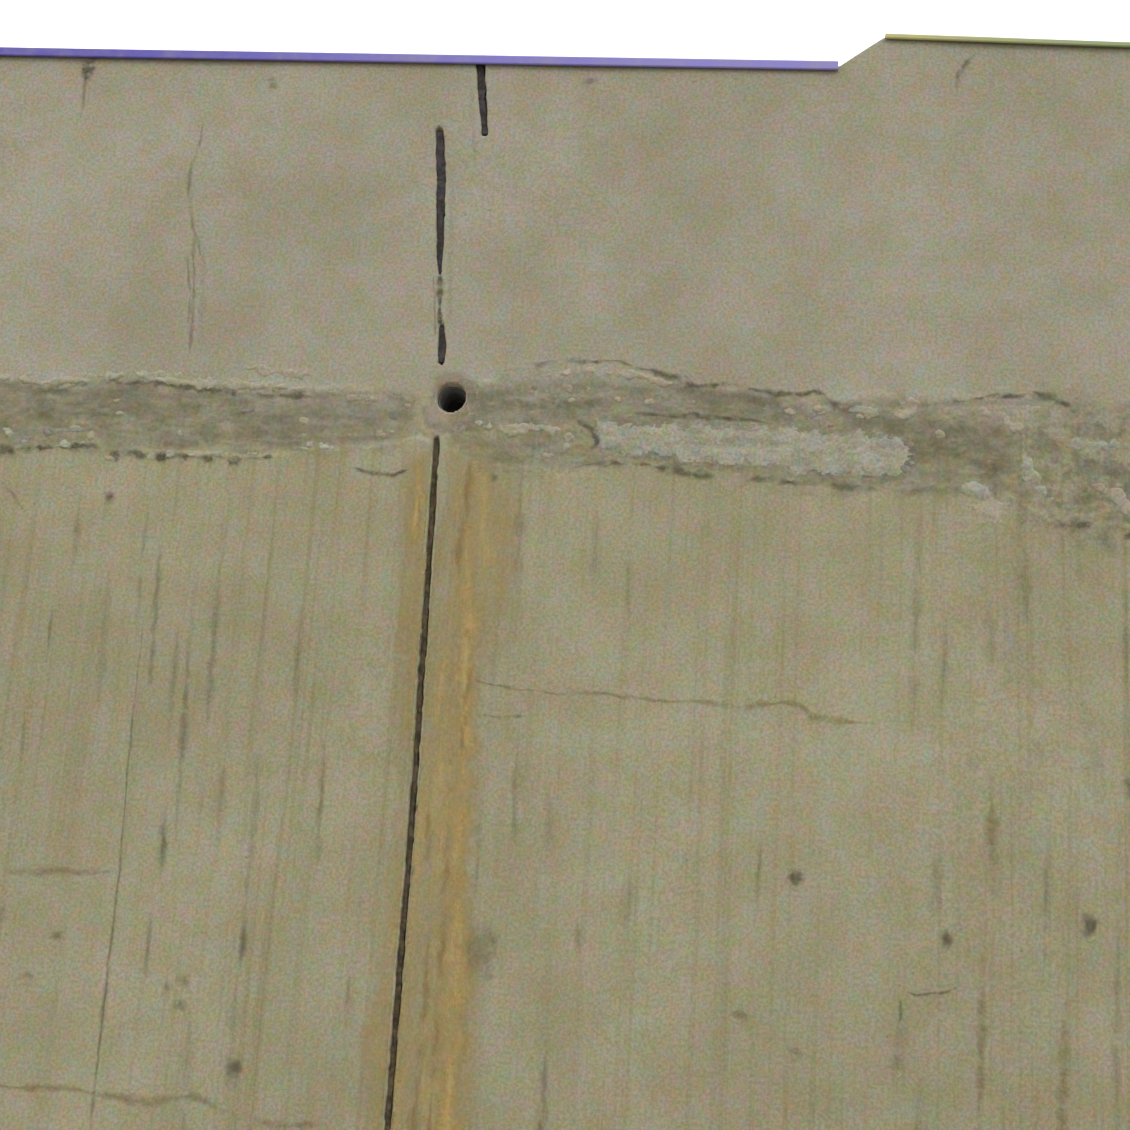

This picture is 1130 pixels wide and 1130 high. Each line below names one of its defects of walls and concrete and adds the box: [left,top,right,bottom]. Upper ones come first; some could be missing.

crack [476,64,488,134]
crack [436,132,446,362]
spalling [0,425,96,453]
spalling [105,450,271,464]
spalling [0,364,377,426]
spalling [473,420,599,459]
spalling [515,360,766,422]
spalling [749,388,923,428]
peeling [959,481,992,501]
spalling [1090,483,1130,516]
crack [385,440,438,1130]
rust [372,458,507,1130]